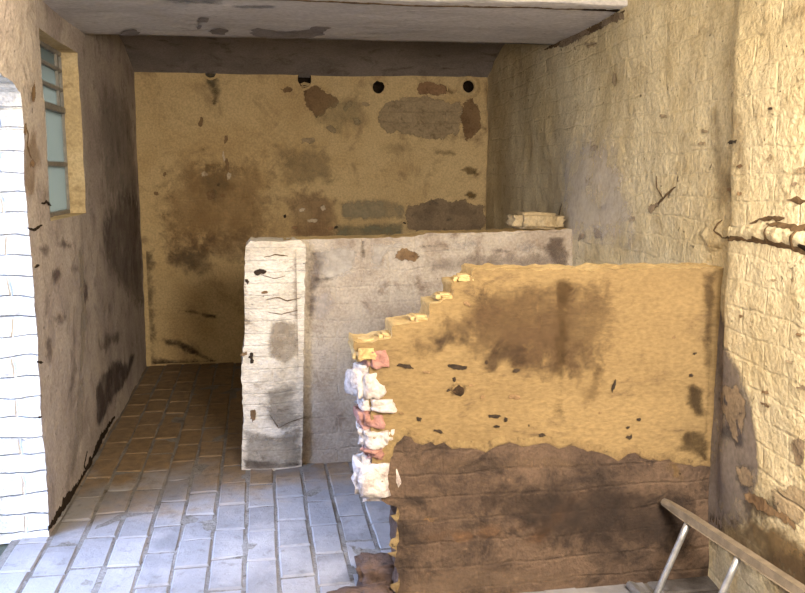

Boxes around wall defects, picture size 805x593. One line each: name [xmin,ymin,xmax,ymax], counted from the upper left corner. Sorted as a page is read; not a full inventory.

spalling [301,82,352,133]
spalling [362,78,483,141]
crack [648,176,676,213]
spalling [292,192,486,263]
crack [713,196,805,255]
leakage [154,341,199,364]
peeling [270,322,294,359]
leakage [466,284,592,376]
leakage [96,355,134,423]
leakage [689,386,702,415]
spalling [326,312,805,593]
leakage [684,432,704,456]